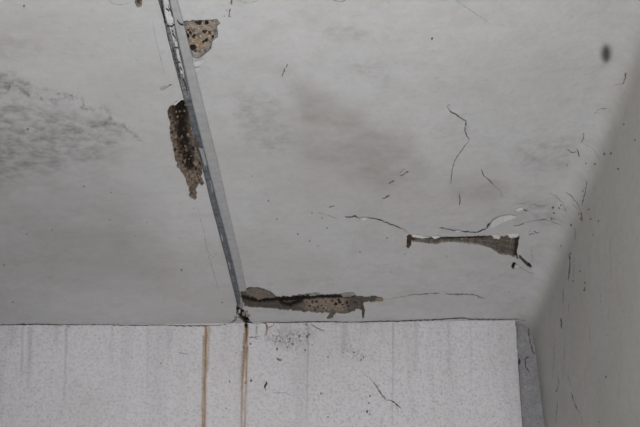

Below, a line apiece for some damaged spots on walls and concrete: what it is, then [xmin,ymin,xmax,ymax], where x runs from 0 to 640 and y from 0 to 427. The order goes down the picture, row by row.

spalling [183,19,220,72]
spalling [167,98,204,200]
crack [448,104,470,178]
crack [331,206,407,232]
crack [440,223,490,233]
spalling [404,233,533,274]
spalling [240,287,384,319]
rust [232,297,252,382]